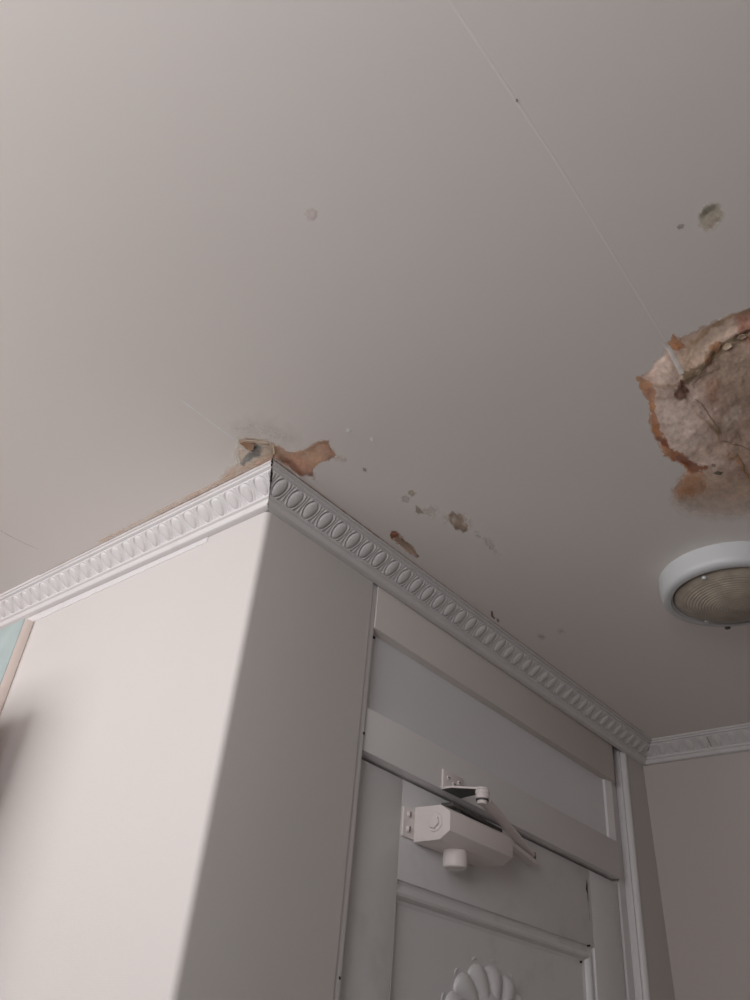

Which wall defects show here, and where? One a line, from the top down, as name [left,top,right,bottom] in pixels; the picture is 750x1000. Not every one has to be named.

peeling [661,330,750,384]
peeling [239,438,275,468]
peeling [390,531,418,557]